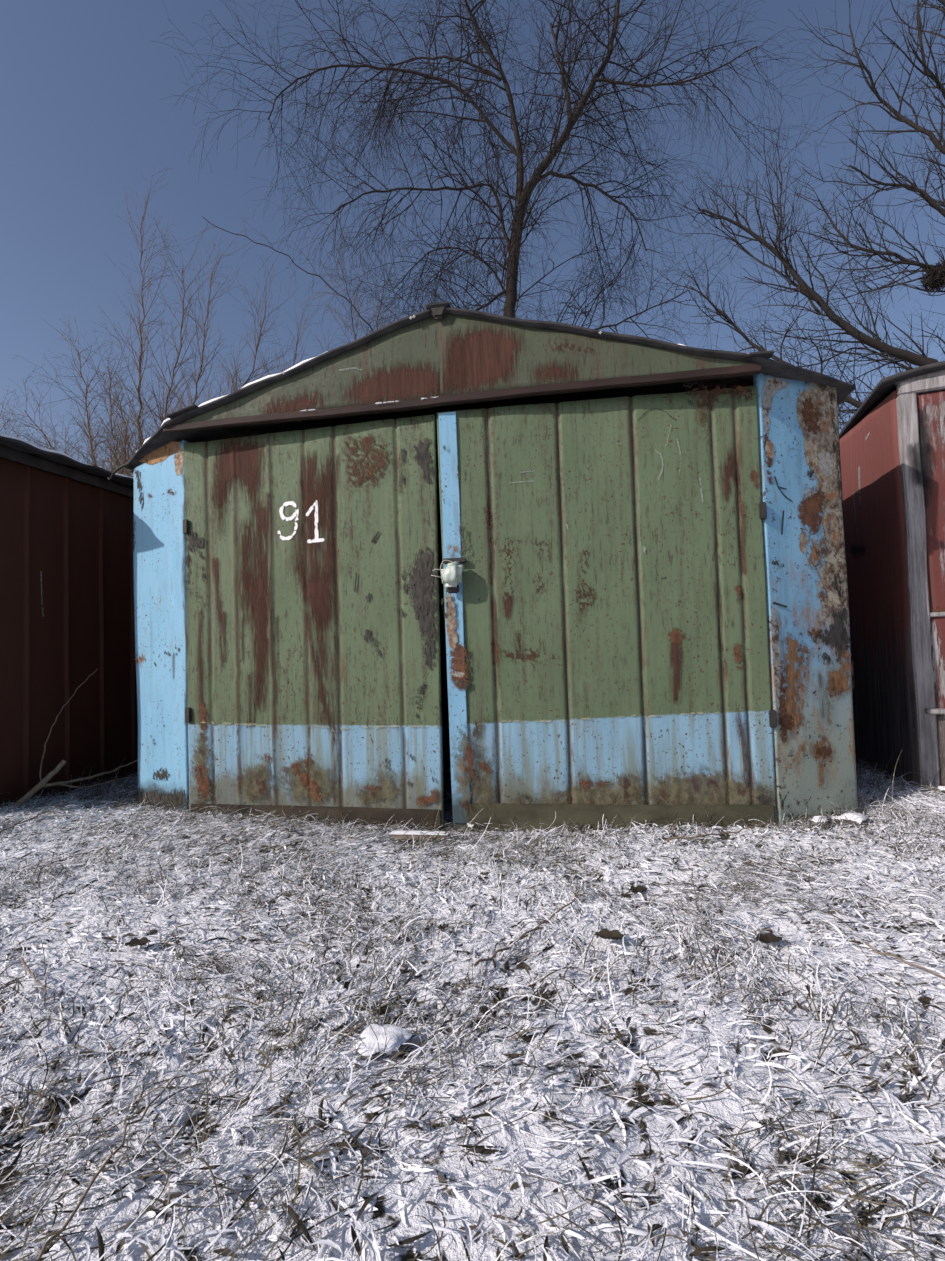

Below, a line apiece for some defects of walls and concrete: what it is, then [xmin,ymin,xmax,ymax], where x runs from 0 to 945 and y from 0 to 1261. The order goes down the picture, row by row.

corrosion [342,326,521,405]
peeling [762,377,788,467]
peeling [796,388,841,507]
peeling [926,401,945,444]
corrosion [183,555,226,804]
corrosion [212,439,278,726]
corrosion [294,434,389,803]
corrosion [450,643,469,690]
peeling [808,603,852,673]
peeling [930,622,945,698]
corrosion [237,754,272,801]
corrosion [737,712,749,788]